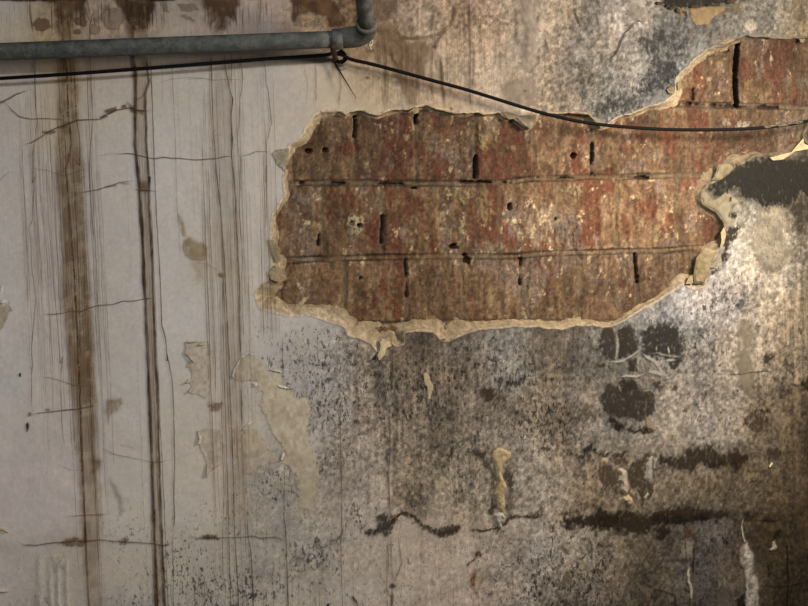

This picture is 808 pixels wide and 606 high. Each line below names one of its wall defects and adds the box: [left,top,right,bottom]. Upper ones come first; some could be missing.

peeling [656,0,741,25]
crack [123,152,229,160]
flaking render [254,19,808,360]
leakage [709,153,808,230]
leakage [712,226,741,274]
crack [51,298,150,315]
peeling [184,341,213,398]
peeling [232,352,319,509]
leakage [376,512,398,536]
crack [364,416,543,606]
leakage [472,448,515,532]
leakage [560,321,759,606]